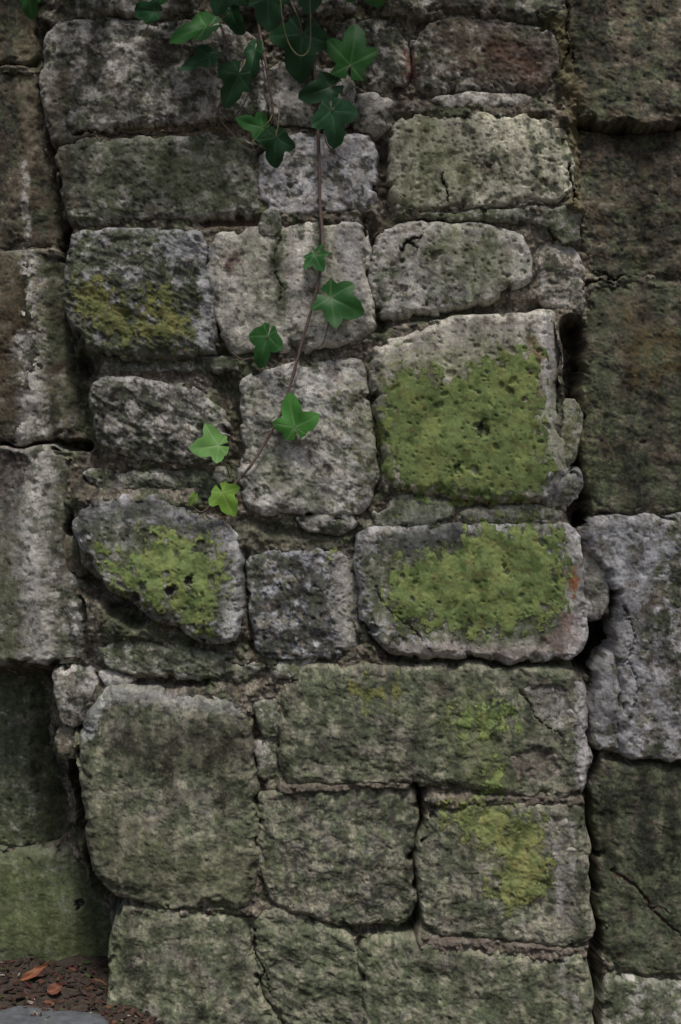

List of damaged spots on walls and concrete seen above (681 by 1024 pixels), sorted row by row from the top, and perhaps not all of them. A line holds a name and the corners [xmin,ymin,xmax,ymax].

crack [441,172,450,202]
crack [399,236,422,253]
crack [610,867,681,936]